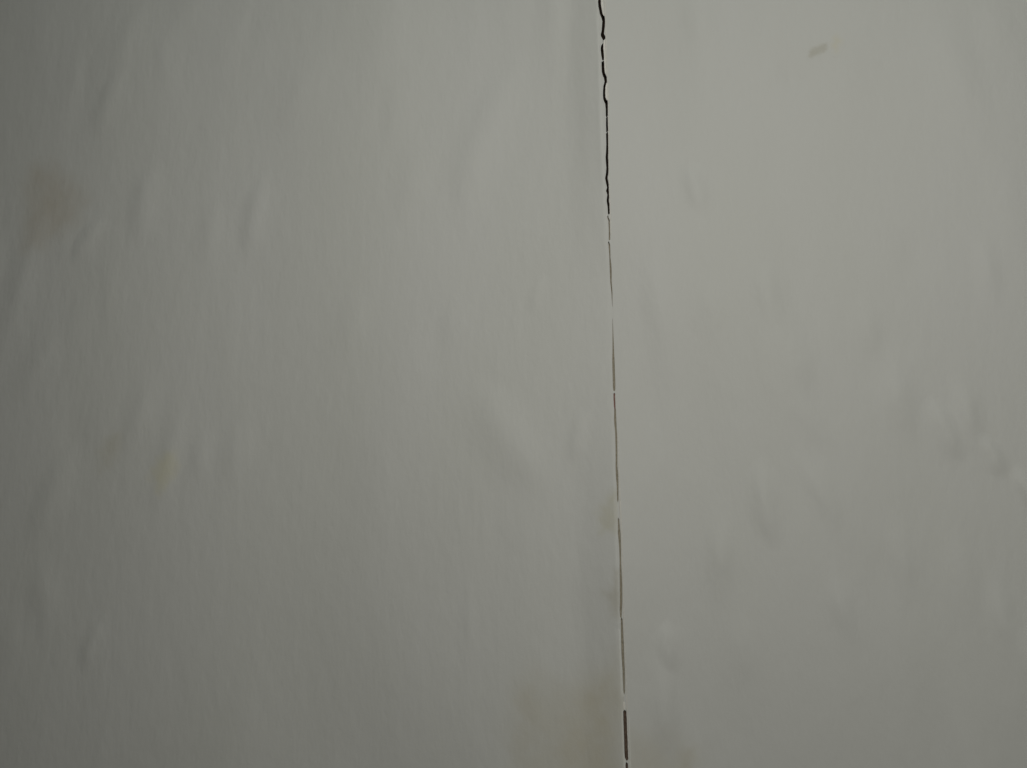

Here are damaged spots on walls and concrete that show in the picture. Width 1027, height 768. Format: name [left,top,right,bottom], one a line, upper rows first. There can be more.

crack [598,0,630,768]